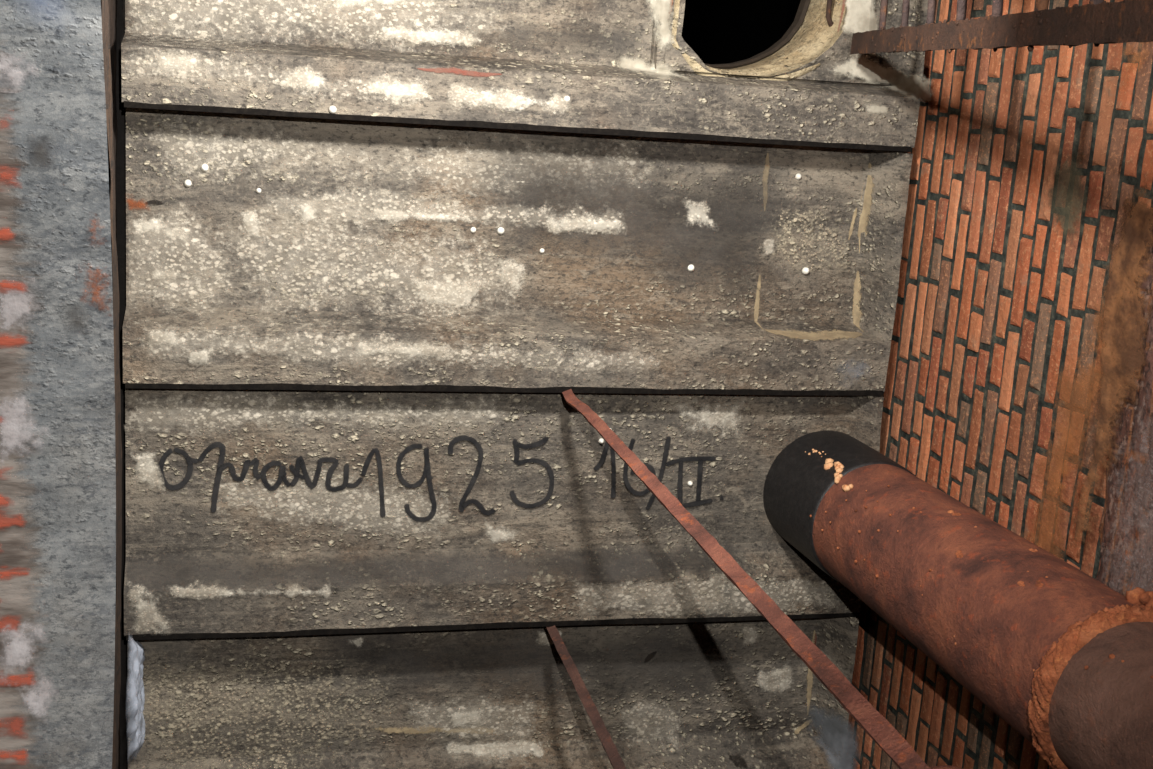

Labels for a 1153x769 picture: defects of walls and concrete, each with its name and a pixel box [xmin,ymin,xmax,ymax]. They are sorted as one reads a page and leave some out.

leakage [1032,185,1153,590]